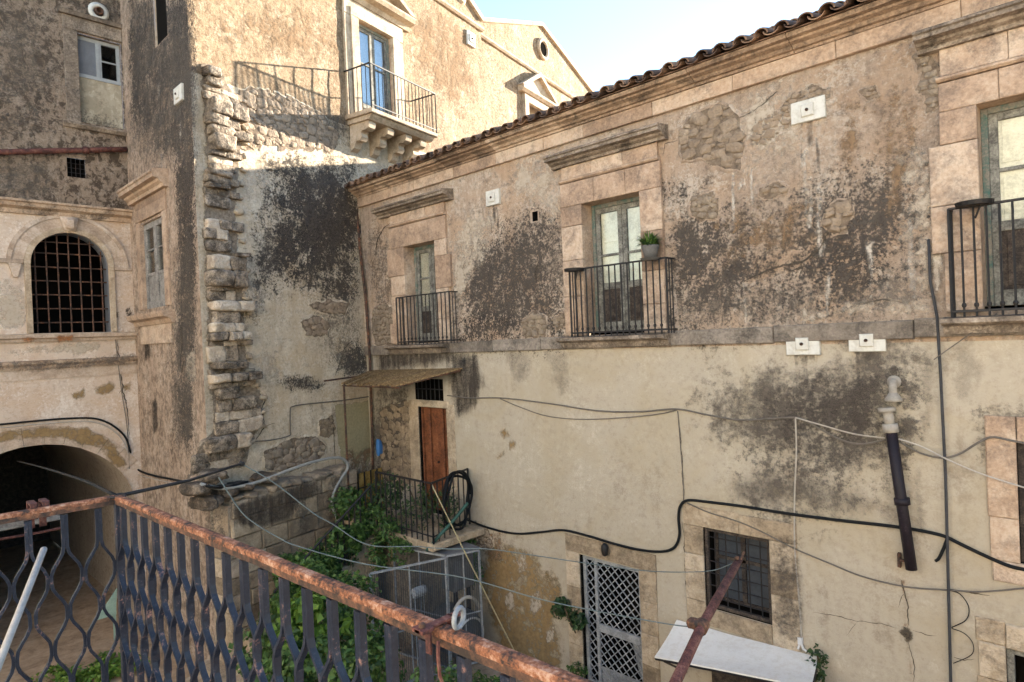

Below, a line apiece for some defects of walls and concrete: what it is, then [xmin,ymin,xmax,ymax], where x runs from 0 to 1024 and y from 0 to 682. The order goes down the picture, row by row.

water stain [74,0,198,454]
spalling [186,63,412,492]
water stain [243,150,480,416]
water stain [453,203,566,358]
peeling [678,83,836,174]
water stain [662,86,942,331]
spalling [820,197,856,238]
water stain [694,340,928,522]
crack [813,580,932,681]